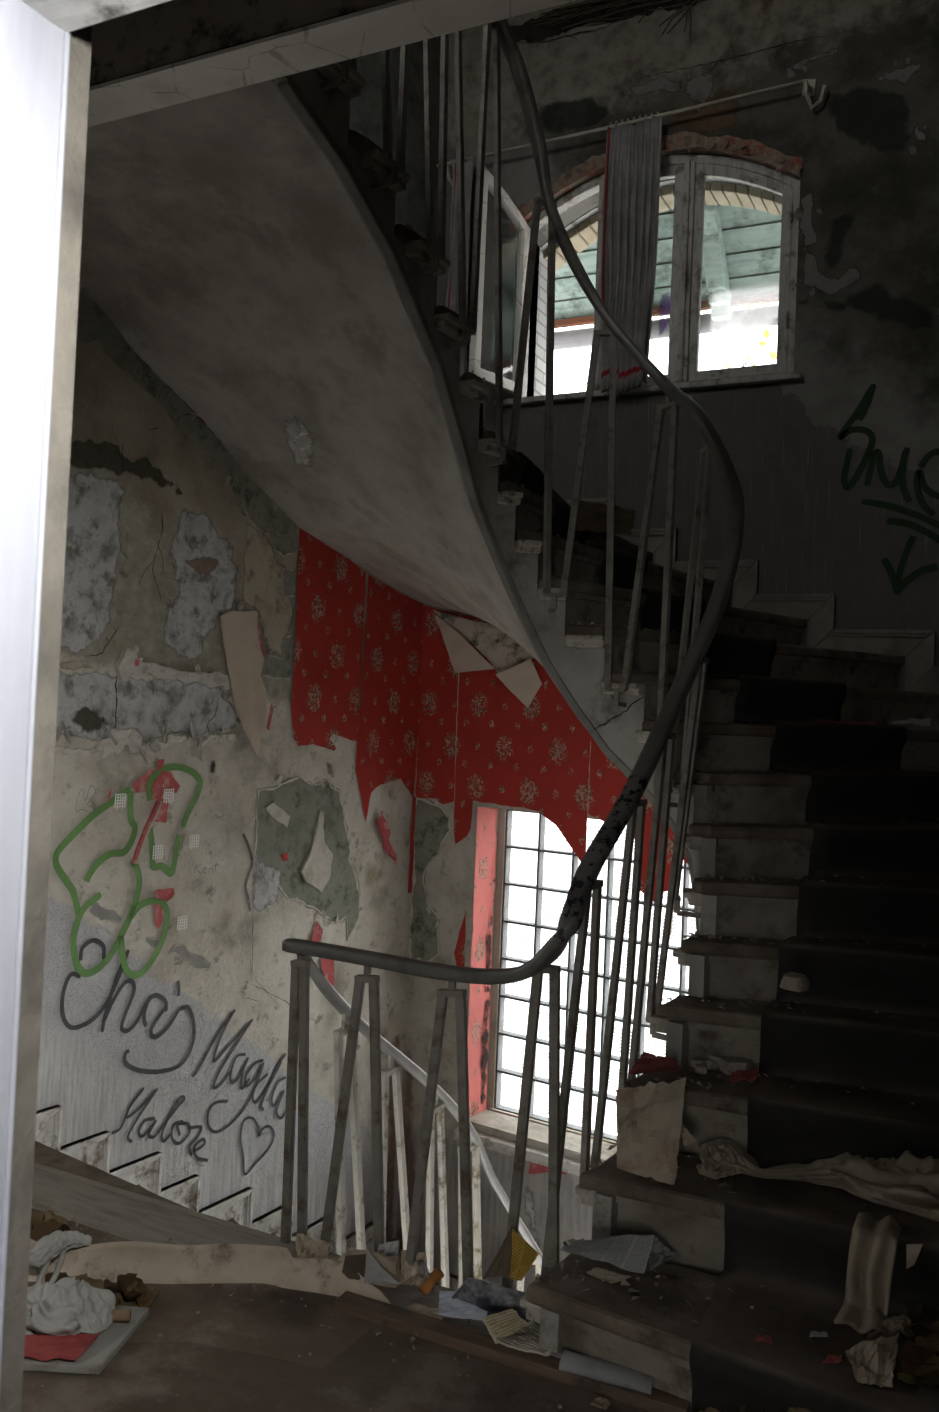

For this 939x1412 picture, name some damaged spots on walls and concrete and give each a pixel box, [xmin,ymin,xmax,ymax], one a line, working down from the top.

flaking render [509,153,606,236]
flaking render [661,131,861,296]
damp [829,86,911,151]
flaking render [55,289,299,763]
flaking render [253,762,363,941]